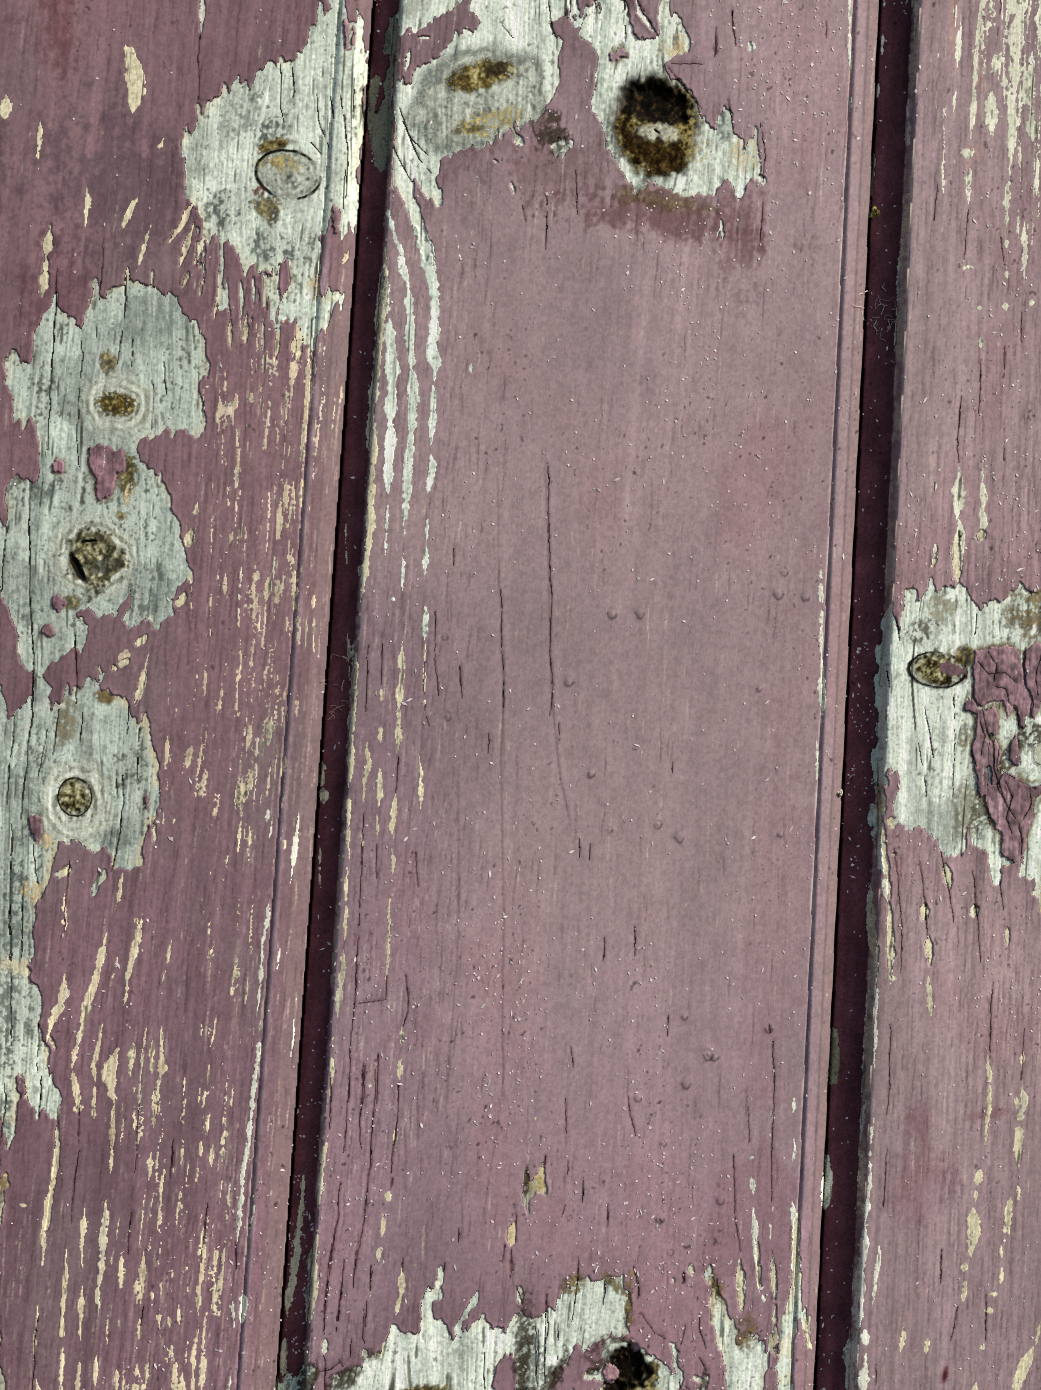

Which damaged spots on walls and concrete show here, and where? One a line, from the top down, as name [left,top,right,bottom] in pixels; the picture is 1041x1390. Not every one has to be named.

peeling [936,0,1041,279]
peeling [0,0,812,1390]
peeling [842,467,1041,1390]